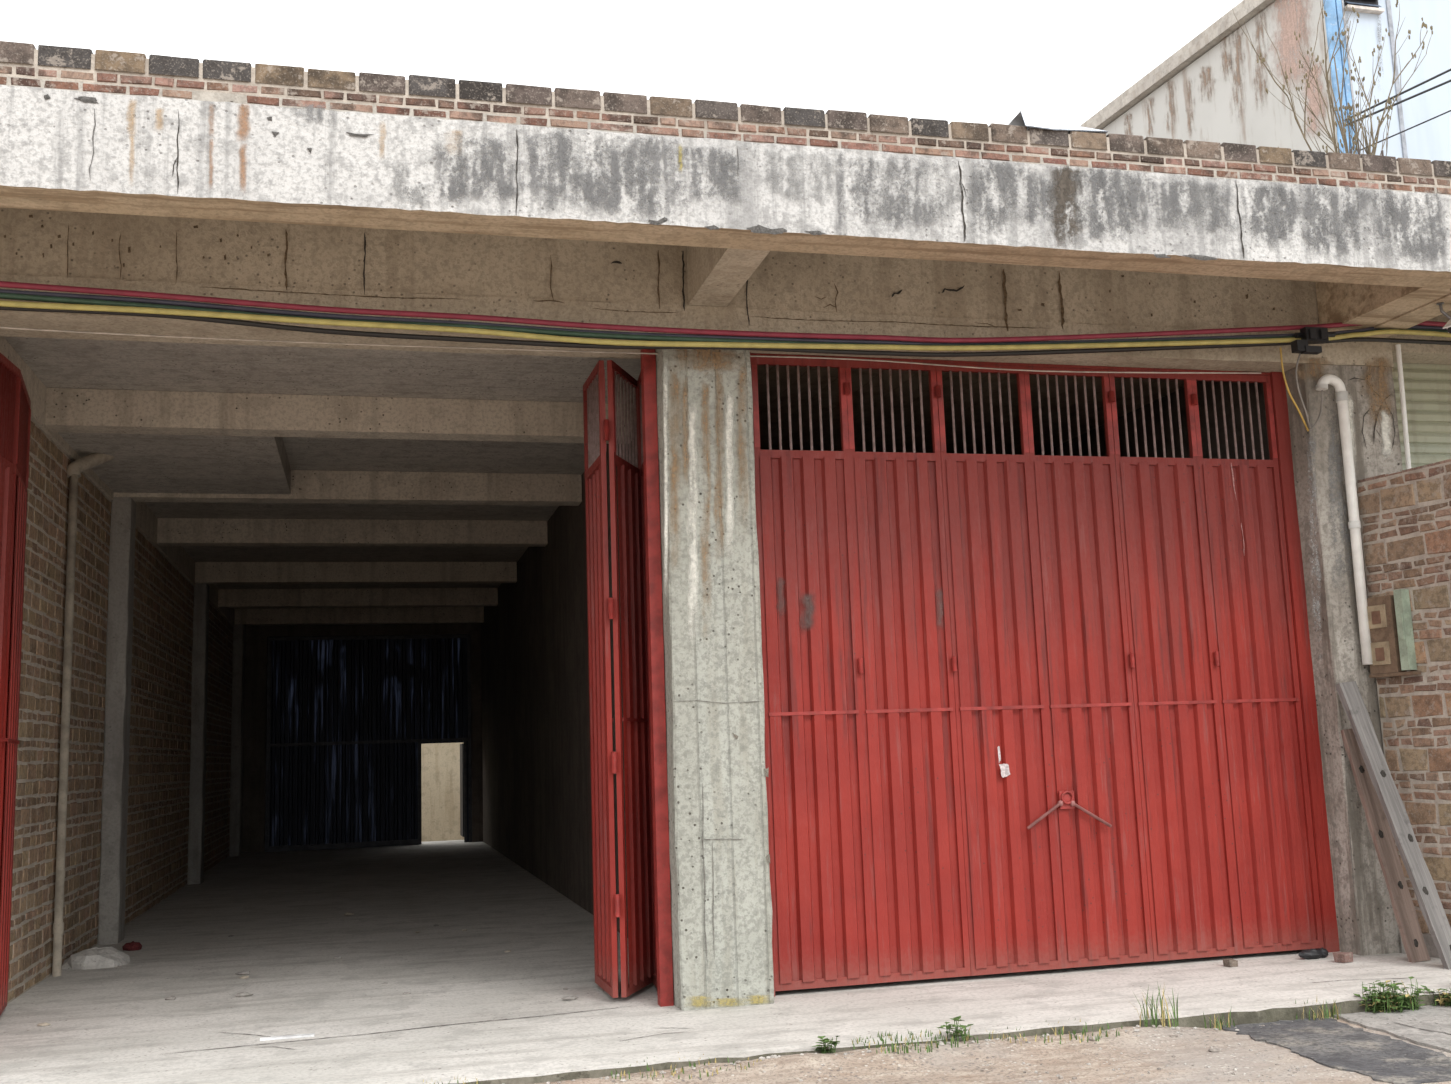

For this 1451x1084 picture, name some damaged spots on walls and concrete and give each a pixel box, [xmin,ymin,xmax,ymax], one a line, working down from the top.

corrosion [239,105,248,184]
leakage [393,132,739,209]
crack [958,161,966,241]
leakage [755,149,1231,240]